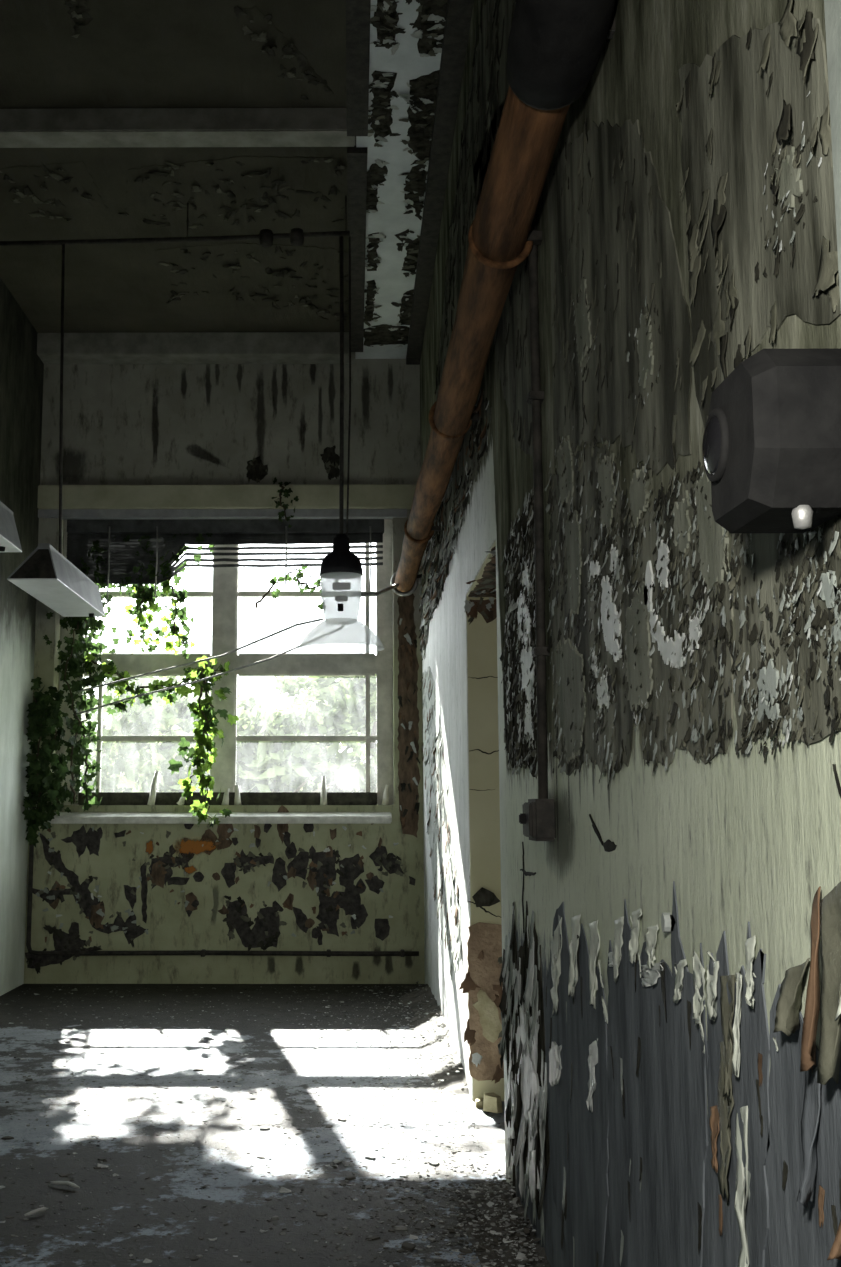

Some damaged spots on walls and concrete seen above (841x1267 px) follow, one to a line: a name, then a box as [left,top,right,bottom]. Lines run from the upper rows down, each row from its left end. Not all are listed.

peeling [364,0,448,348]
peeling [25,389,841,1267]